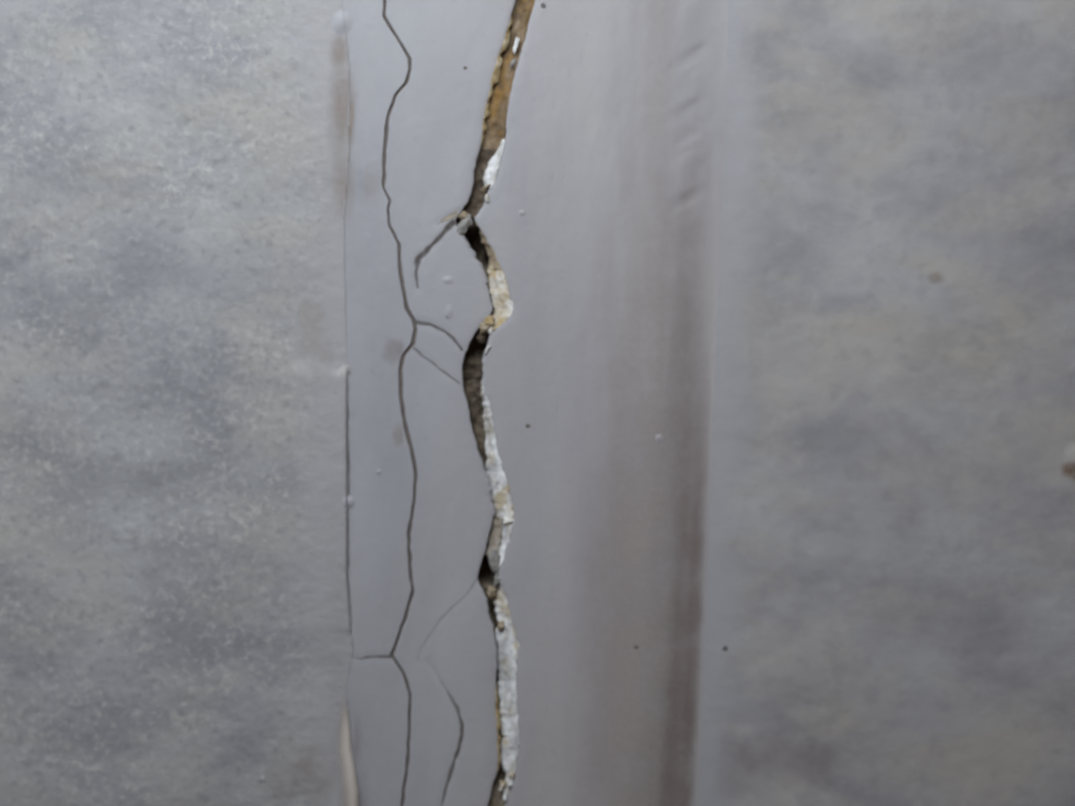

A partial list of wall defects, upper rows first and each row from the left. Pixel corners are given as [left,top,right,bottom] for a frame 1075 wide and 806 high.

crack [376,0,535,806]